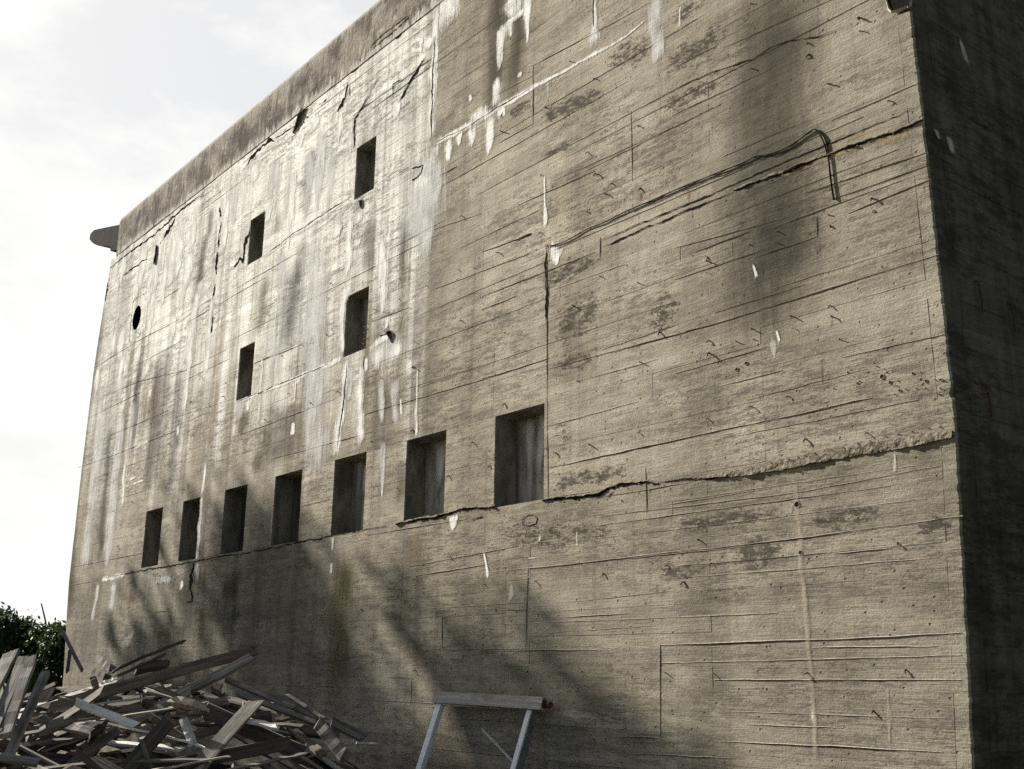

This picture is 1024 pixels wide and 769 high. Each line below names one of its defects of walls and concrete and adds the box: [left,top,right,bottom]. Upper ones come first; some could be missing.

efflorescence [436,0,460,30]
damp [491,0,531,106]
efflorescence [590,0,598,45]
crack [247,126,294,165]
damp [544,87,601,122]
crack [601,106,924,247]
damp [112,204,213,409]
crack [105,196,250,332]
damp [333,208,390,454]
efflorescence [379,368,418,435]
crack [542,478,690,502]
crack [108,504,494,602]